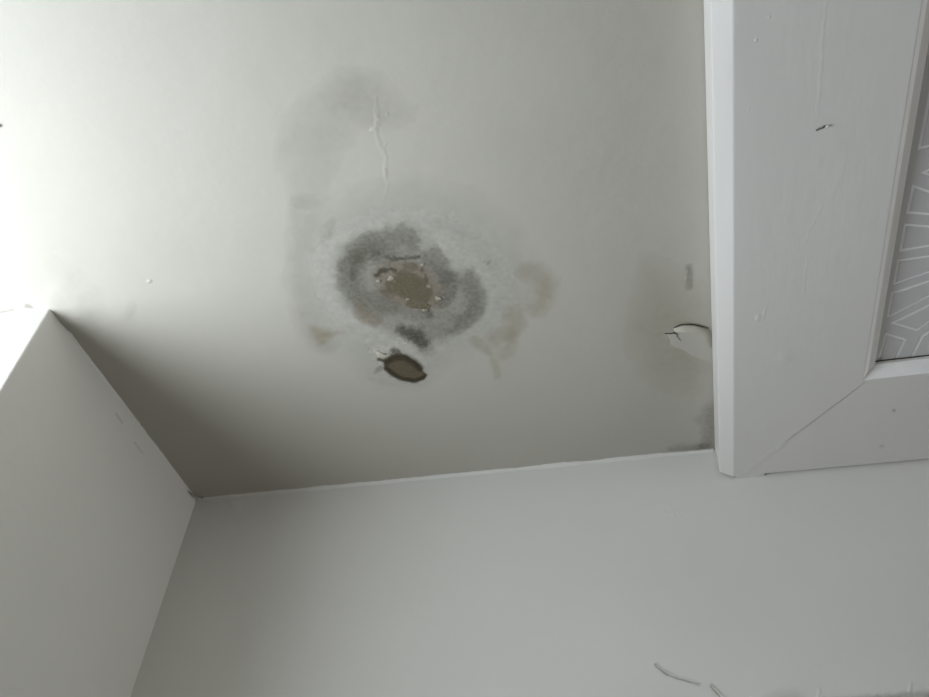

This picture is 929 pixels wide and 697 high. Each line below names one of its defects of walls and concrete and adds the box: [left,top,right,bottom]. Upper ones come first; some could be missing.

damp [318,237,476,347]
spalling [374,340,427,382]
crack [653,662,724,697]